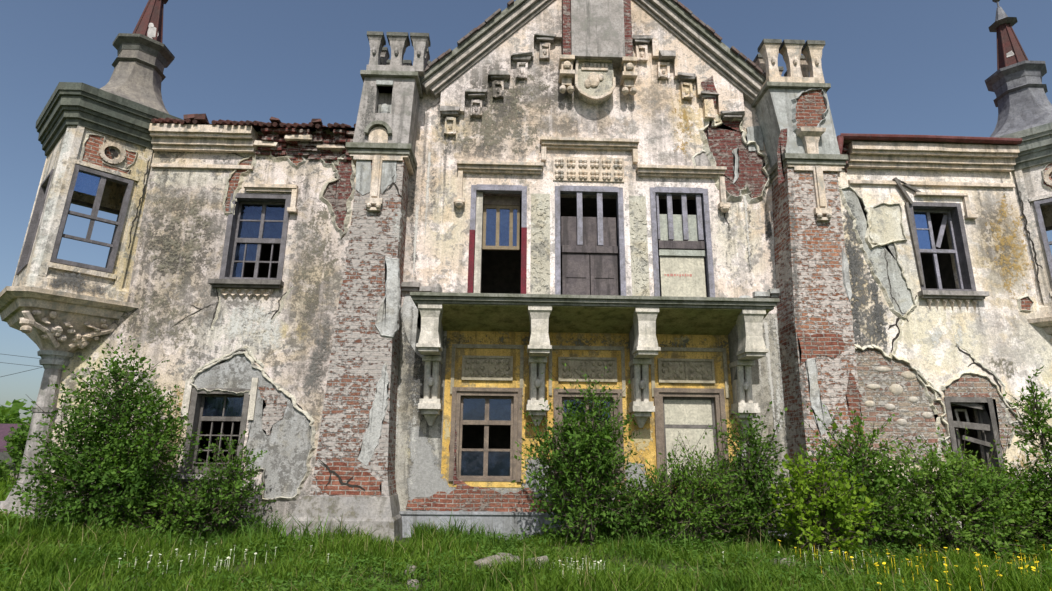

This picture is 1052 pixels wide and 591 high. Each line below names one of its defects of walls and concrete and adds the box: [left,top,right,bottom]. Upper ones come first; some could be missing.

spalling [297,128,356,240]
spalling [692,76,787,204]
crack [171,288,221,330]
crack [189,286,295,382]
flaking render [190,351,382,503]
spalling [404,419,673,512]
water stain [843,197,888,354]
crack [839,186,942,396]
spalling [797,330,1029,464]
water stain [913,192,1034,299]
crack [956,344,1031,426]
crack [1019,191,1042,291]